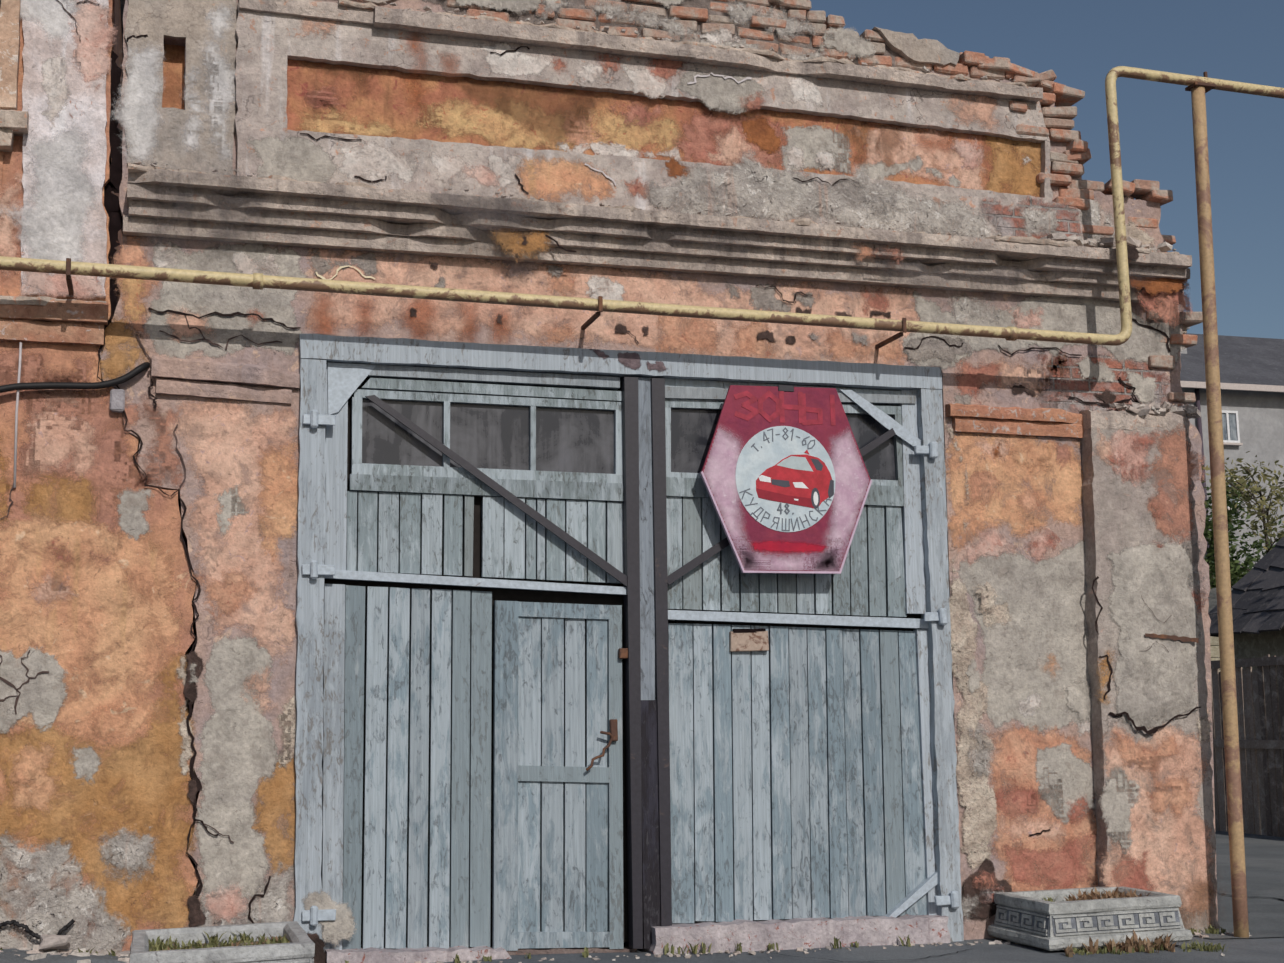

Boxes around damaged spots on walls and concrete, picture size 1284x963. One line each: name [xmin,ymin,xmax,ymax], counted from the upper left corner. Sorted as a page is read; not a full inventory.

crack [57,0,100,41]
peeling [128,133,755,219]
spalling [478,42,765,165]
spalling [338,0,1028,108]
spalling [780,125,852,174]
spalling [981,199,1180,260]
peeling [589,276,1193,405]
crack [97,35,218,927]
crack [0,647,68,733]
flaking render [949,519,1066,919]
crack [1116,707,1201,735]
flaking render [0,835,131,953]